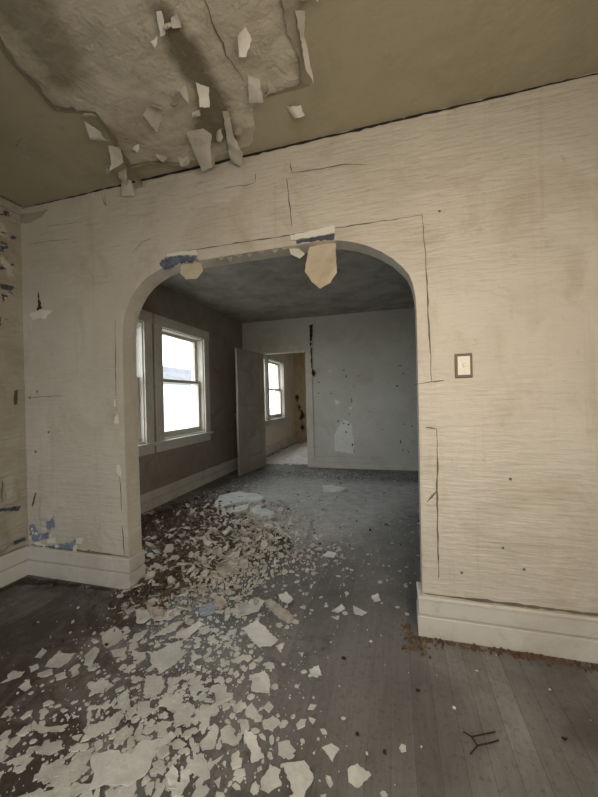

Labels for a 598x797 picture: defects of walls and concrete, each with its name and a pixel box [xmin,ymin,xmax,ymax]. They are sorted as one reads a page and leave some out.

peeling [0,0,314,196]
peeling [0,210,17,302]
peeling [159,250,225,279]
peeling [289,225,337,289]
peeling [330,393,355,455]
peeling [13,516,90,553]